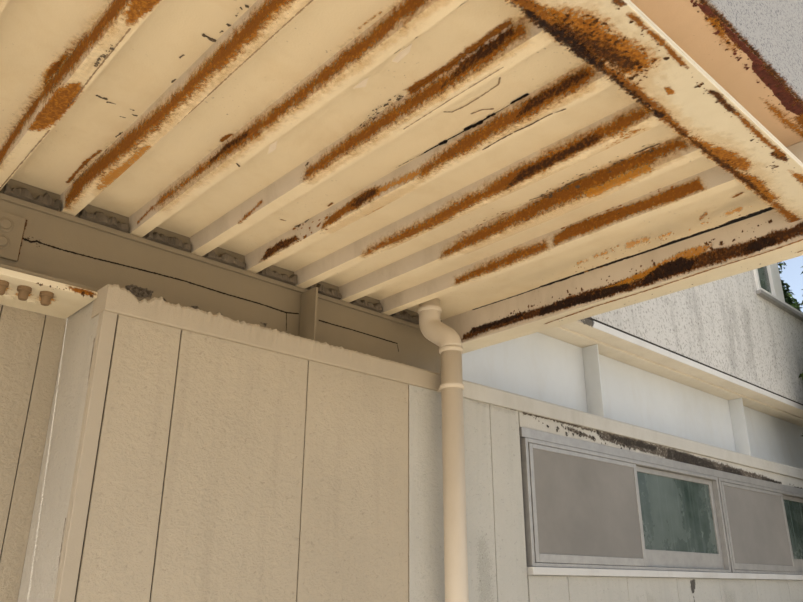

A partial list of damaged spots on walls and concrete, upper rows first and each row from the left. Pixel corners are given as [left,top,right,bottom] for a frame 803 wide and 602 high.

corrosion [0,0,161,189]
corrosion [65,0,313,207]
corrosion [137,0,425,224]
crack [399,93,529,166]
corrosion [261,0,803,340]
spalling [125,284,166,301]
crack [23,236,299,331]
crack [319,320,399,352]